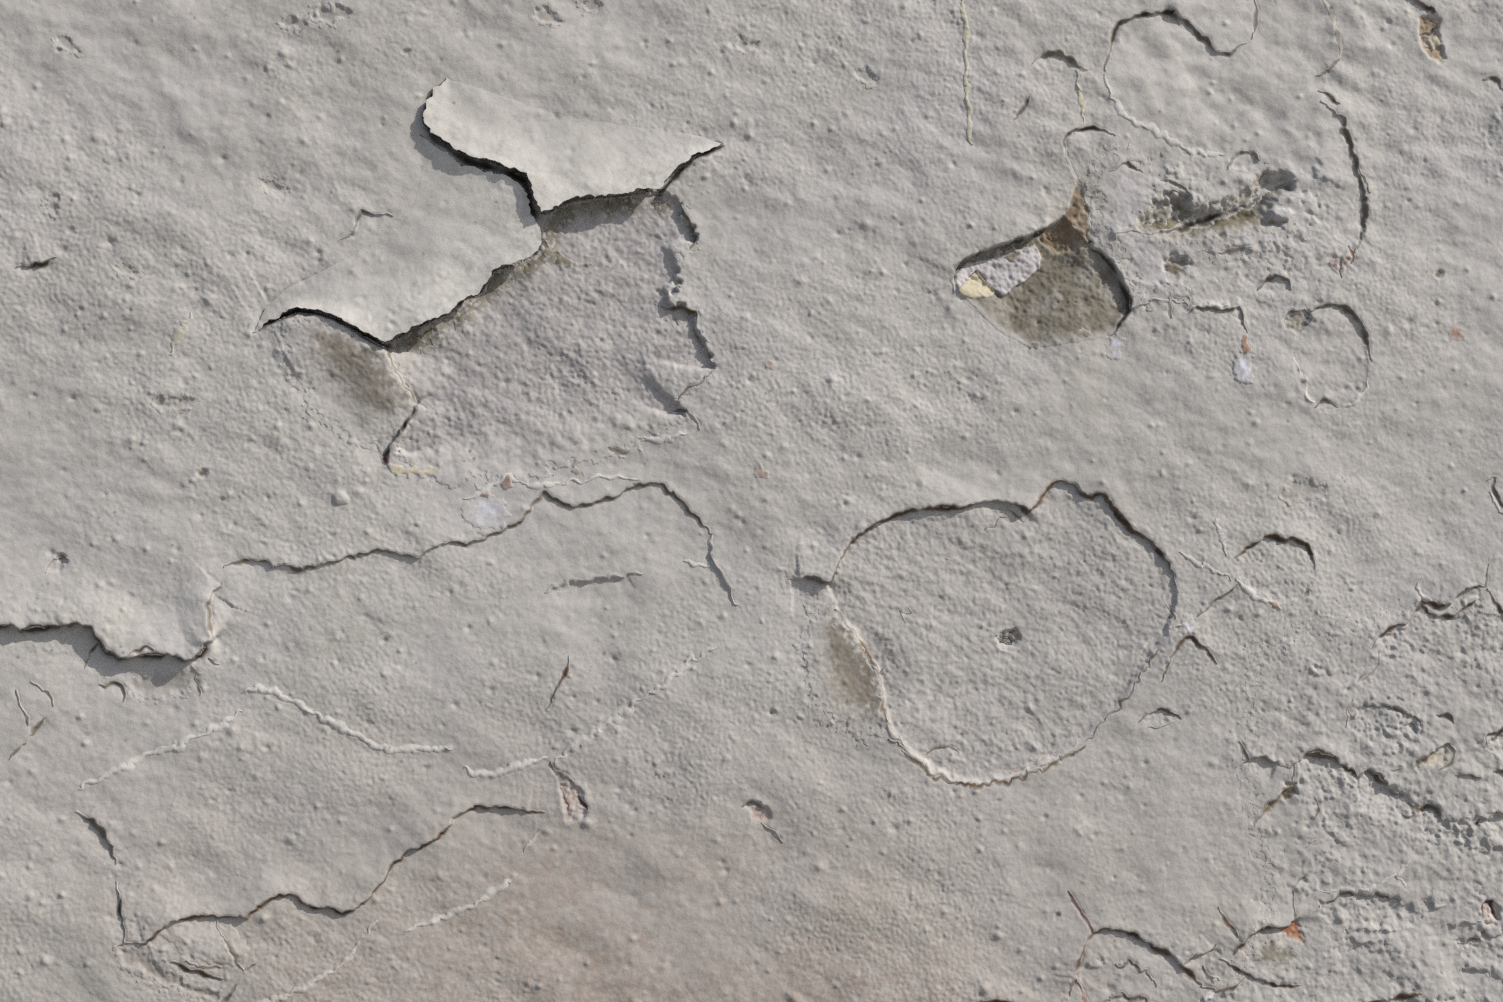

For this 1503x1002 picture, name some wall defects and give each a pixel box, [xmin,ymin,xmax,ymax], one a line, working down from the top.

flaking render [255,77,721,490]
crack [1109,160,1143,173]
peeling [949,123,1309,350]
crack [1104,0,1260,71]
crack [1150,297,1248,333]
crack [1317,0,1371,252]
crack [0,481,738,709]
crack [9,681,54,760]
crack [1239,563,1503,913]
crack [76,804,545,1002]
crack [1068,891,1302,1002]
crack [1358,990,1422,1002]